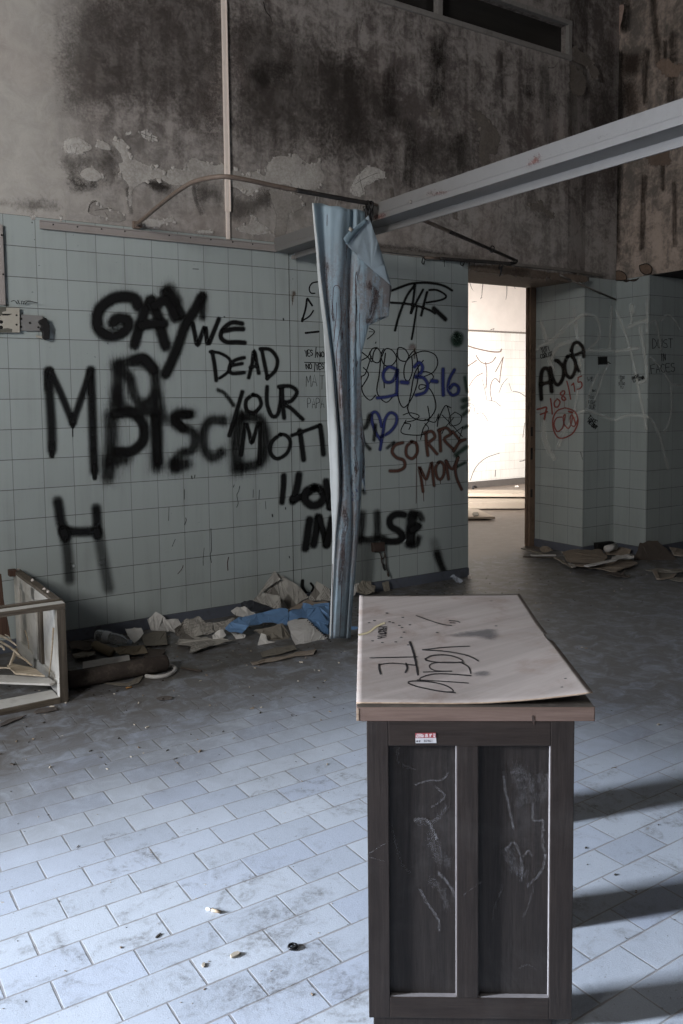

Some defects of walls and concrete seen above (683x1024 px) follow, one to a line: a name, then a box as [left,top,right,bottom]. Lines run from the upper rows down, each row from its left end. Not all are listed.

water stain [618,0,676,120]
peeling [61,129,325,237]
peeling [350,165,395,198]
water stain [639,177,647,249]